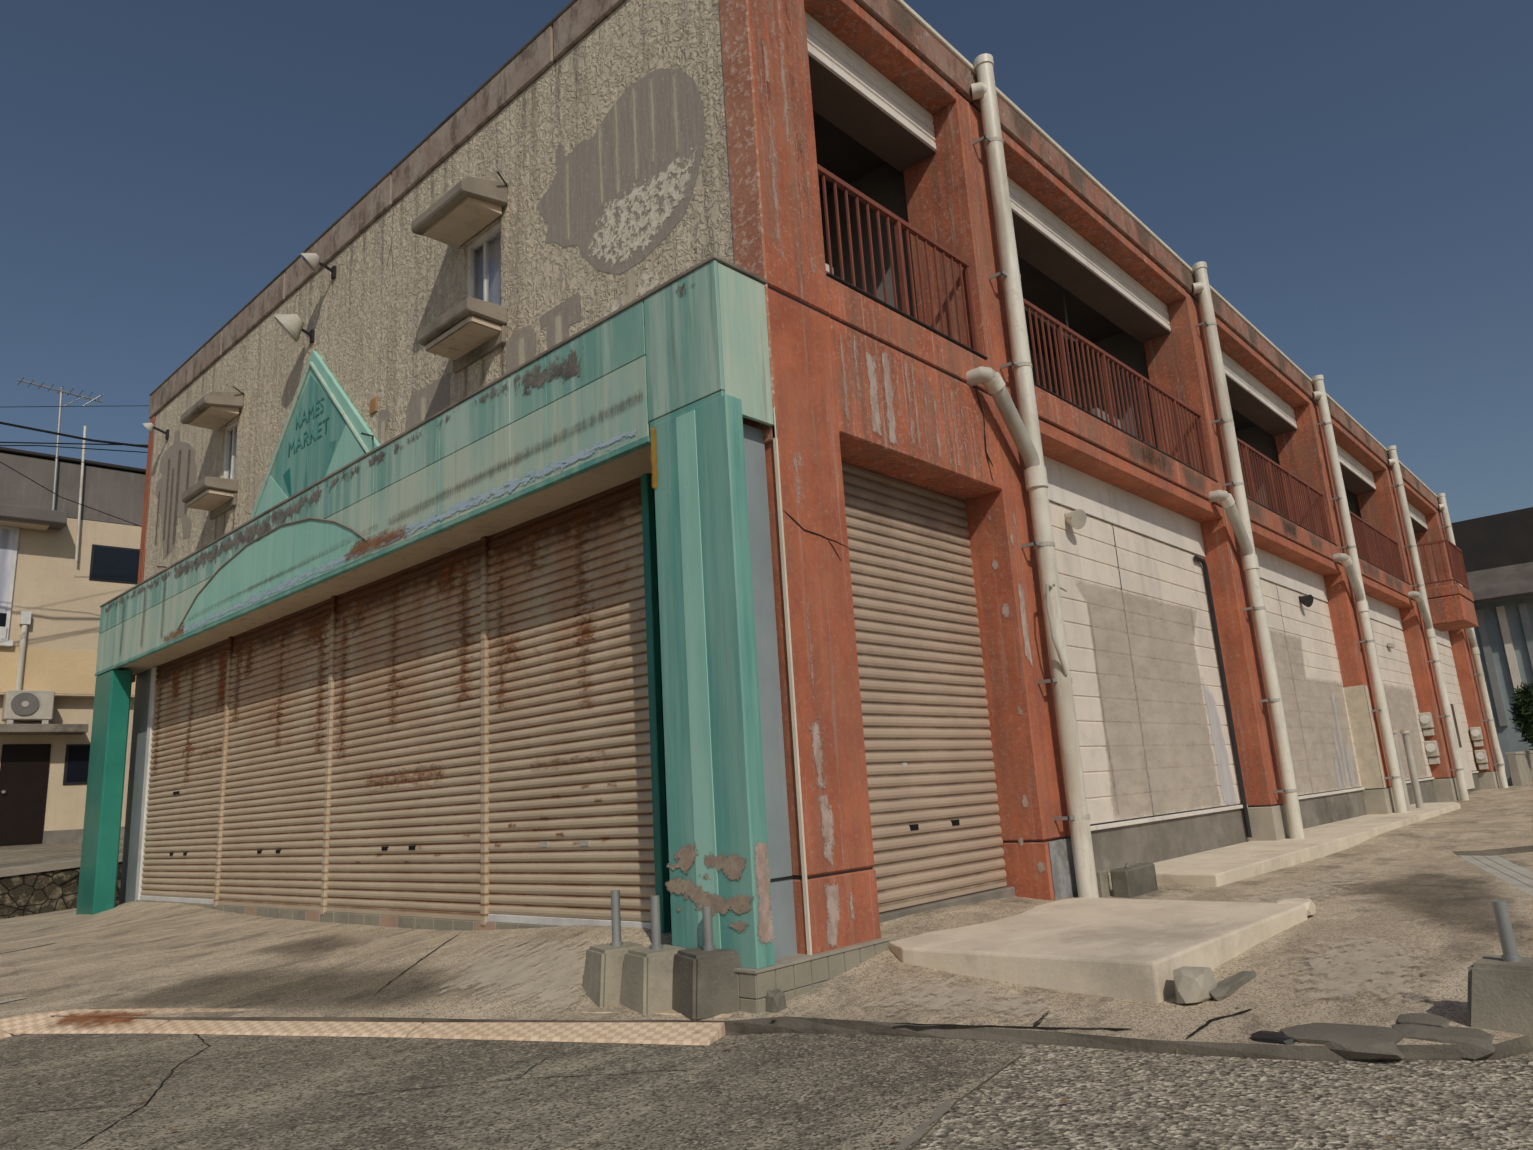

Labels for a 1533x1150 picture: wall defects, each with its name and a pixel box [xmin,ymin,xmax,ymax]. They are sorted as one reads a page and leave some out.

peeling [537,68,705,317]
peeling [475,292,584,403]
peeling [105,373,450,612]
corrosion [346,529,405,560]
crack [785,511,849,560]
corrosion [153,664,220,782]
corrosion [215,642,252,722]
corrosion [304,594,365,756]
corrosion [438,561,471,701]
corrosion [573,513,595,708]
peeling [665,842,774,943]